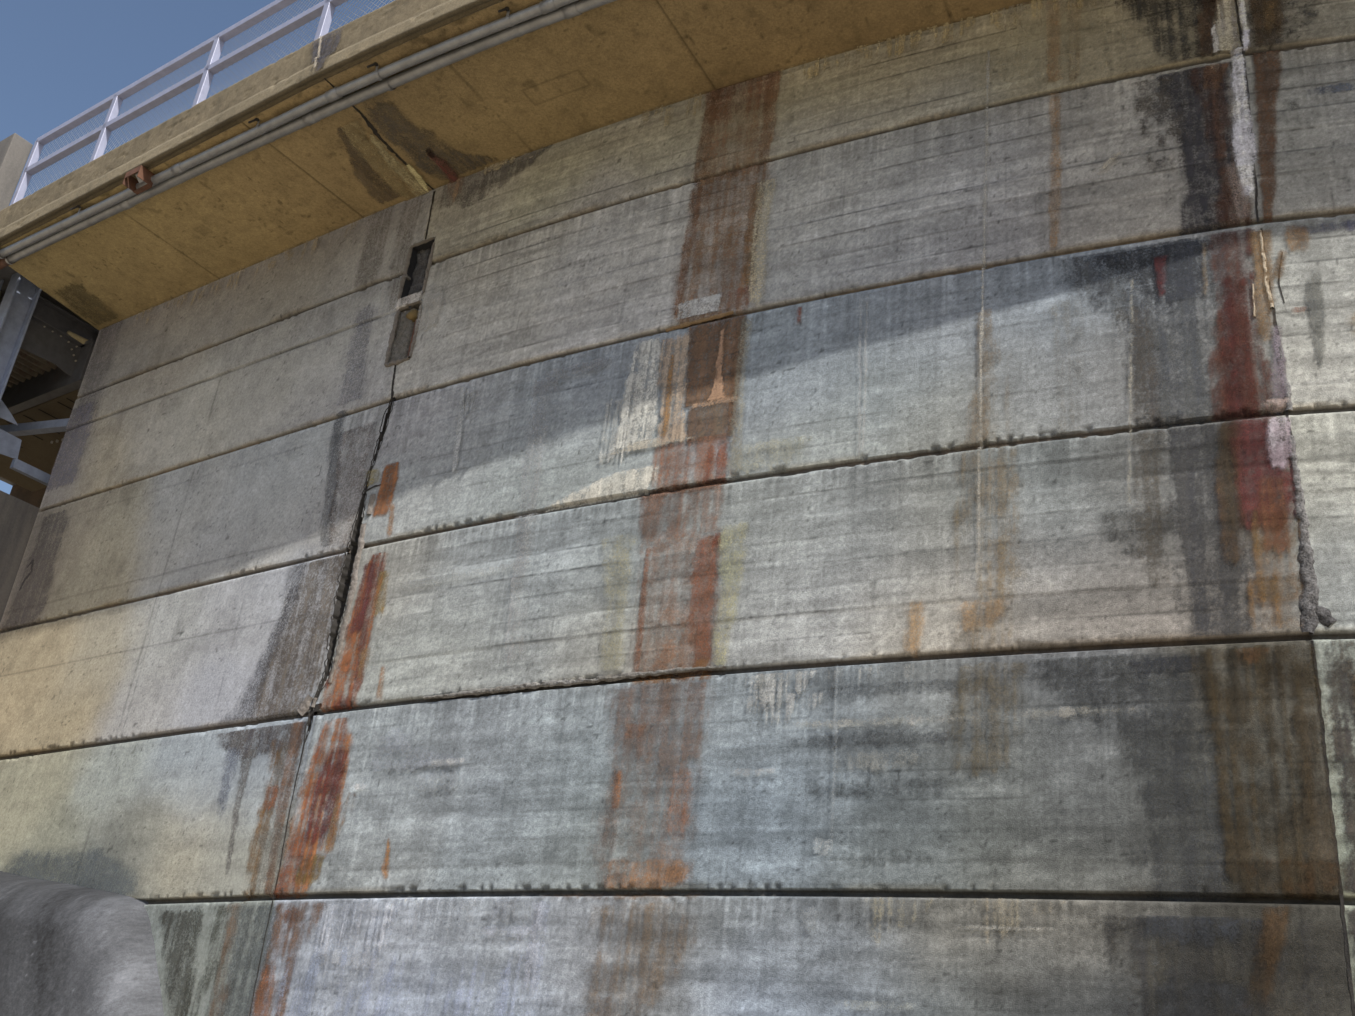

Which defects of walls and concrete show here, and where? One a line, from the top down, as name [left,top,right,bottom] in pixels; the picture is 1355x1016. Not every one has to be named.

damp [161,305,375,1016]
corrosion [210,552,386,1016]
crack [249,365,396,1016]
corrosion [368,462,399,534]
damp [337,82,551,327]
corrosion [586,162,768,1016]
damp [979,0,1319,635]
damp [1025,640,1355,1016]
corrosion [1190,0,1309,627]
crack [1234,0,1285,335]
crack [1285,410,1293,436]
damp [1305,274,1325,366]